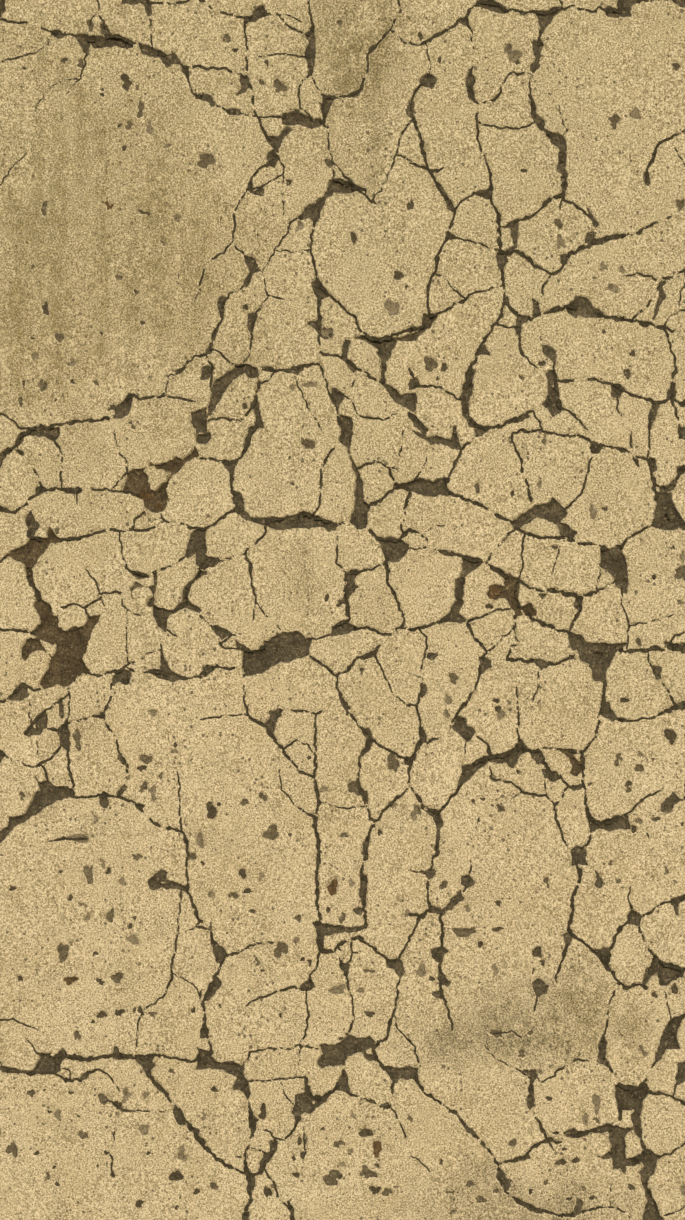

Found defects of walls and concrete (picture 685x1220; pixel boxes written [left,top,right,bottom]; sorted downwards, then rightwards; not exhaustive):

crack [0,0,167,114]
crack [0,153,27,186]
crack [643,129,685,186]
crack [124,0,672,456]
crack [0,267,685,1121]
crack [103,836,631,1220]
crack [633,1138,685,1161]
crack [648,1190,685,1216]